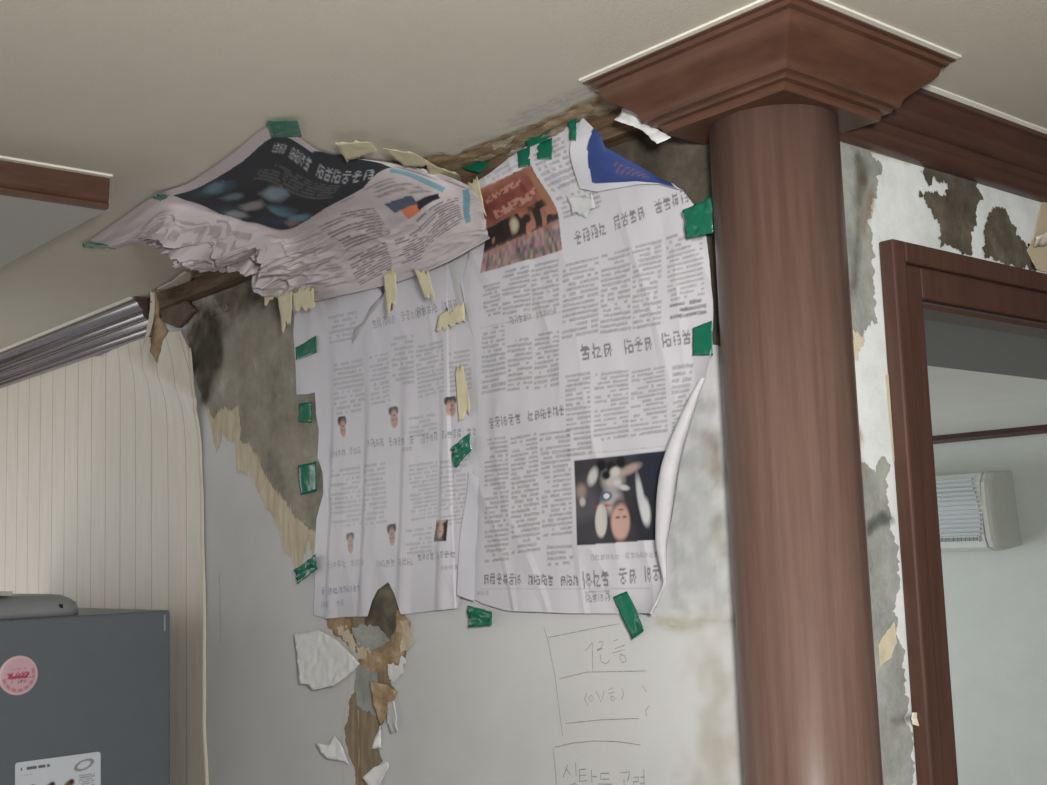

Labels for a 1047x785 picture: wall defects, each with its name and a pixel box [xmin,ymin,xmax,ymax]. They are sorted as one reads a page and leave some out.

spalling [840,142,883,361]
spalling [919,167,1036,271]
spalling [187,280,323,569]
spalling [354,665,378,716]
spalling [364,583,399,639]
spalling [862,456,919,785]